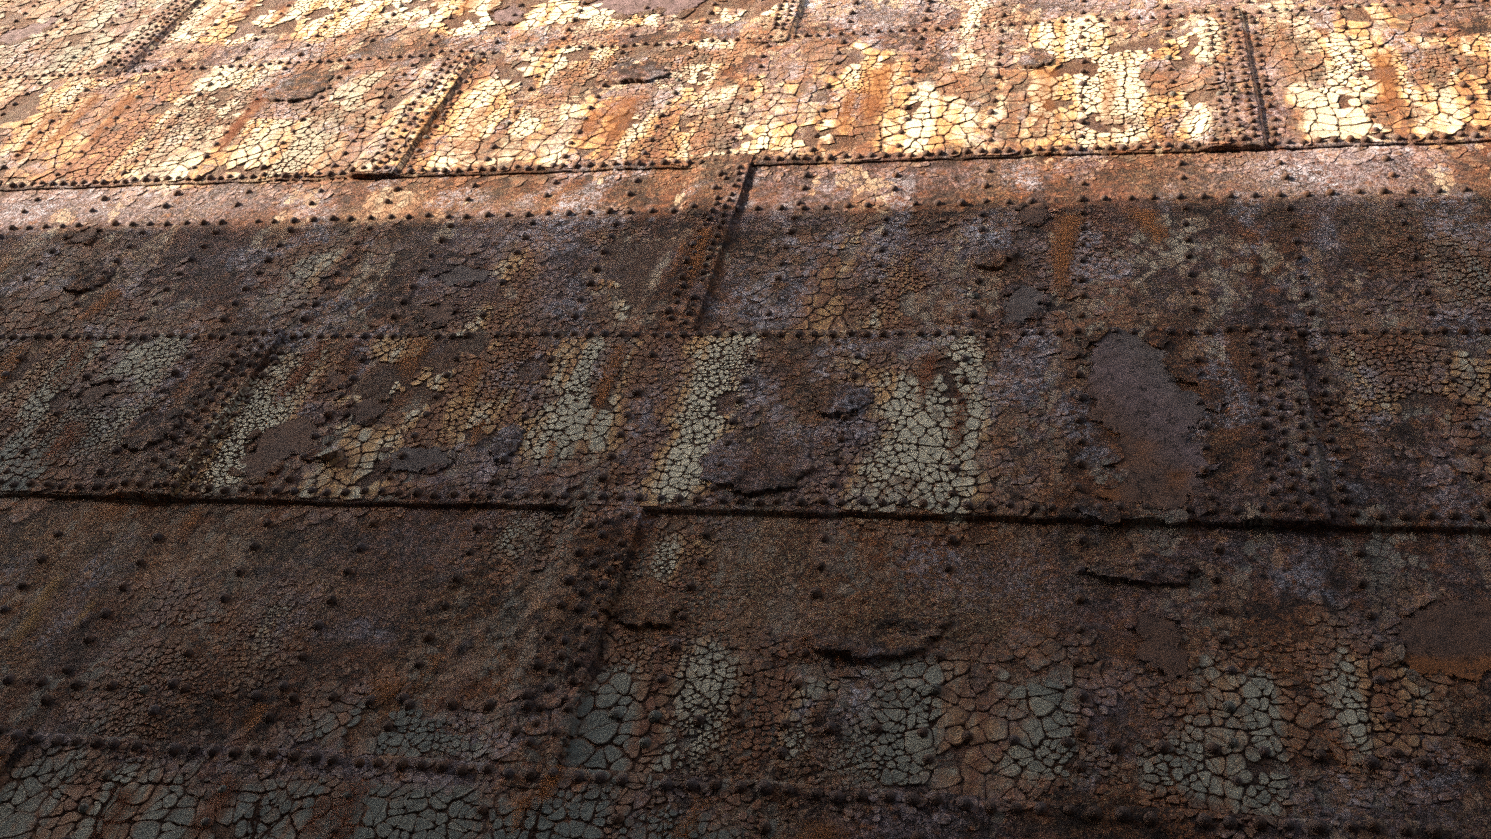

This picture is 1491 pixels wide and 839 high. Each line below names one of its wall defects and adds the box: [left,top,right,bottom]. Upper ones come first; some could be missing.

peeling [0,189,1491,839]
crack [89,790,116,839]
crack [250,793,270,839]
crack [528,801,544,839]